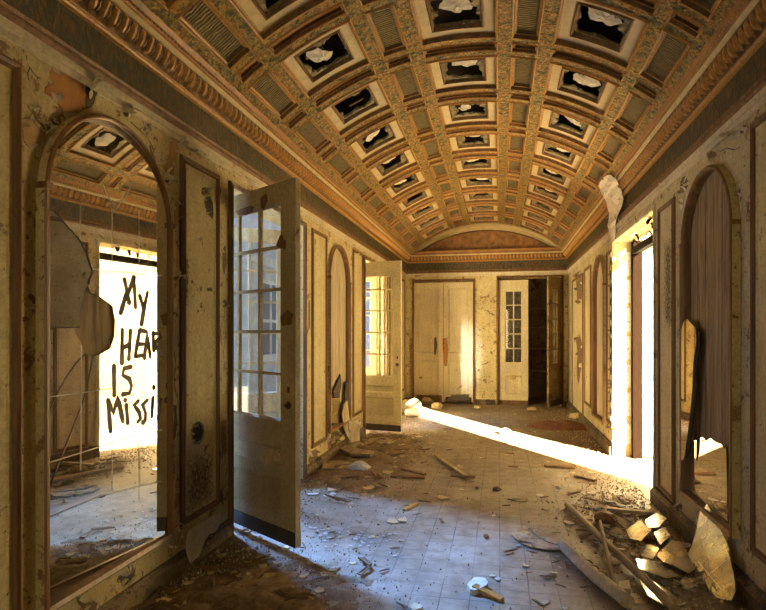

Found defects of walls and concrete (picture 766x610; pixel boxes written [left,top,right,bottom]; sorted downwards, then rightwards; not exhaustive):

peeling [45,66,104,113]
flaking render [597,175,653,244]